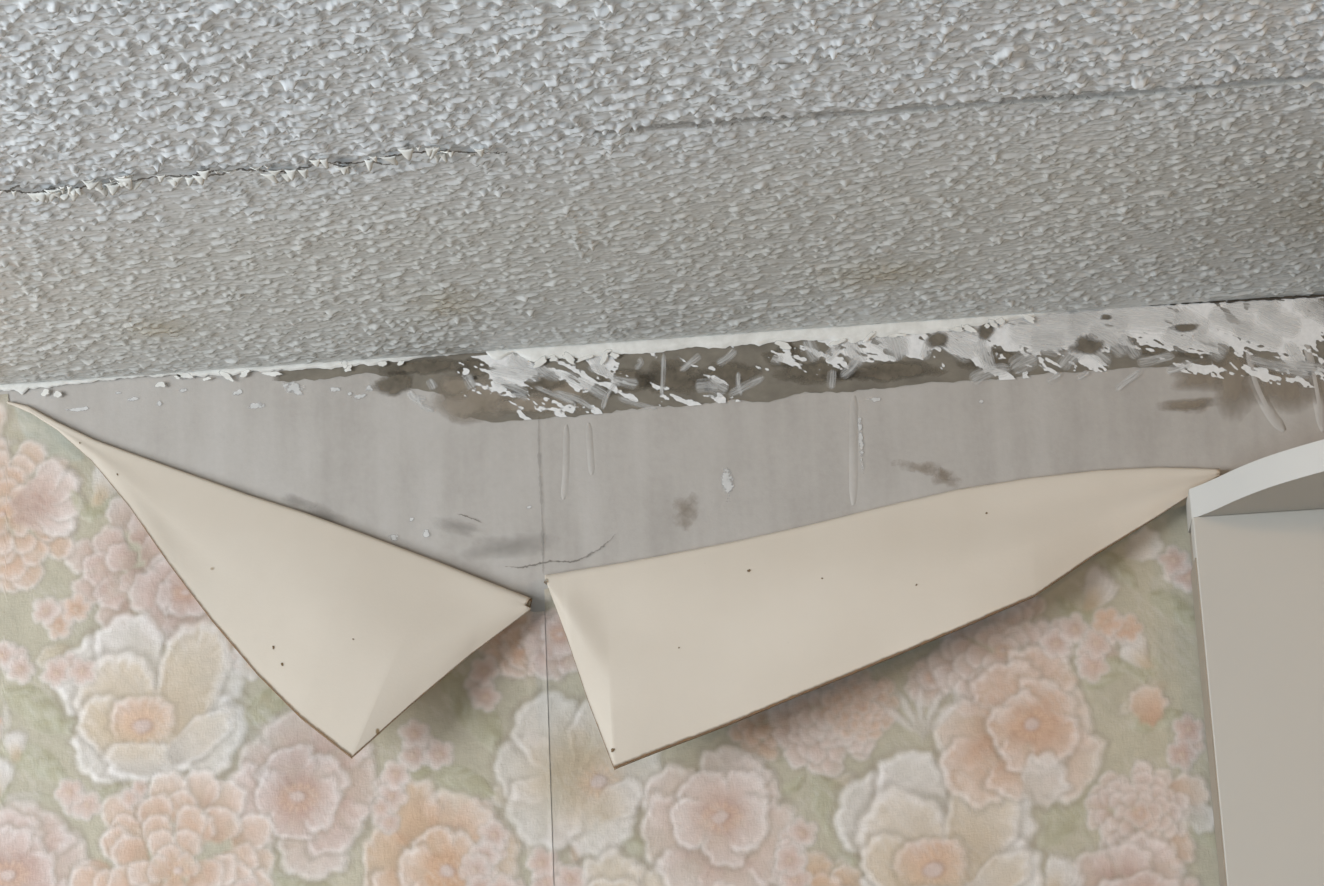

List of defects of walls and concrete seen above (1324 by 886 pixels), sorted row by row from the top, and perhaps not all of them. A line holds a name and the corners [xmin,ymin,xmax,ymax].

crack [0,146,507,203]
flaking render [0,294,1324,423]